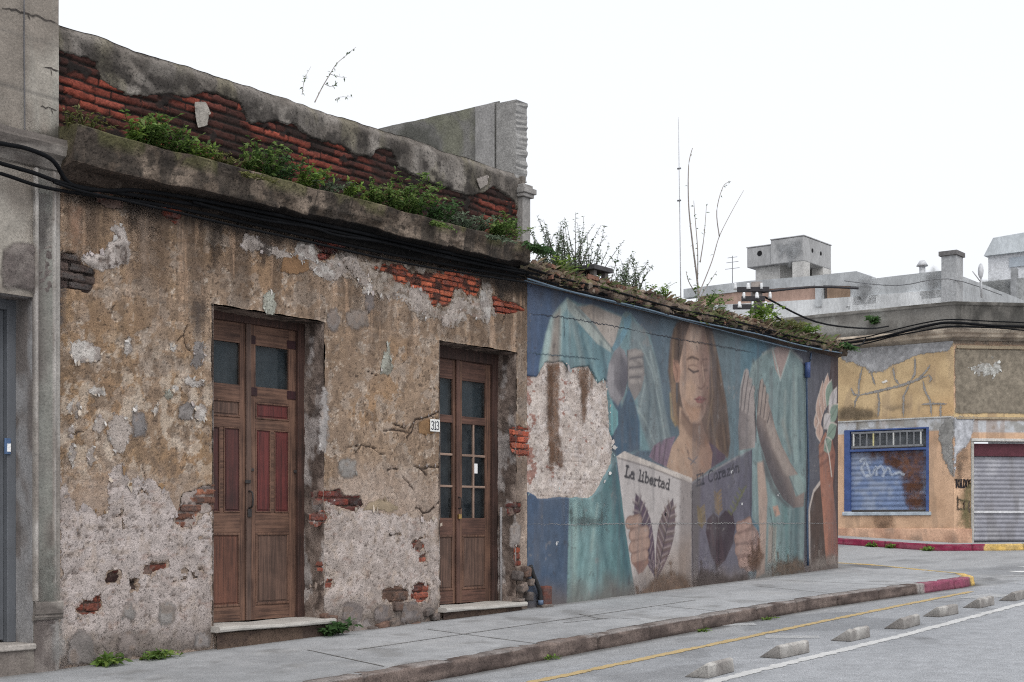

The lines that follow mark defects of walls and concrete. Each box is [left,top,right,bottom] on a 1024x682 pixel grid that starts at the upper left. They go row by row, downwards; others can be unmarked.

spalling [58,51,518,241]
peeling [60,223,131,293]
peeling [240,233,524,328]
flaking render [841,341,953,383]
spalling [505,362,617,515]
corrosion [870,448,926,510]
flaking render [938,416,975,476]
peeling [59,402,215,668]
peeling [308,487,442,633]